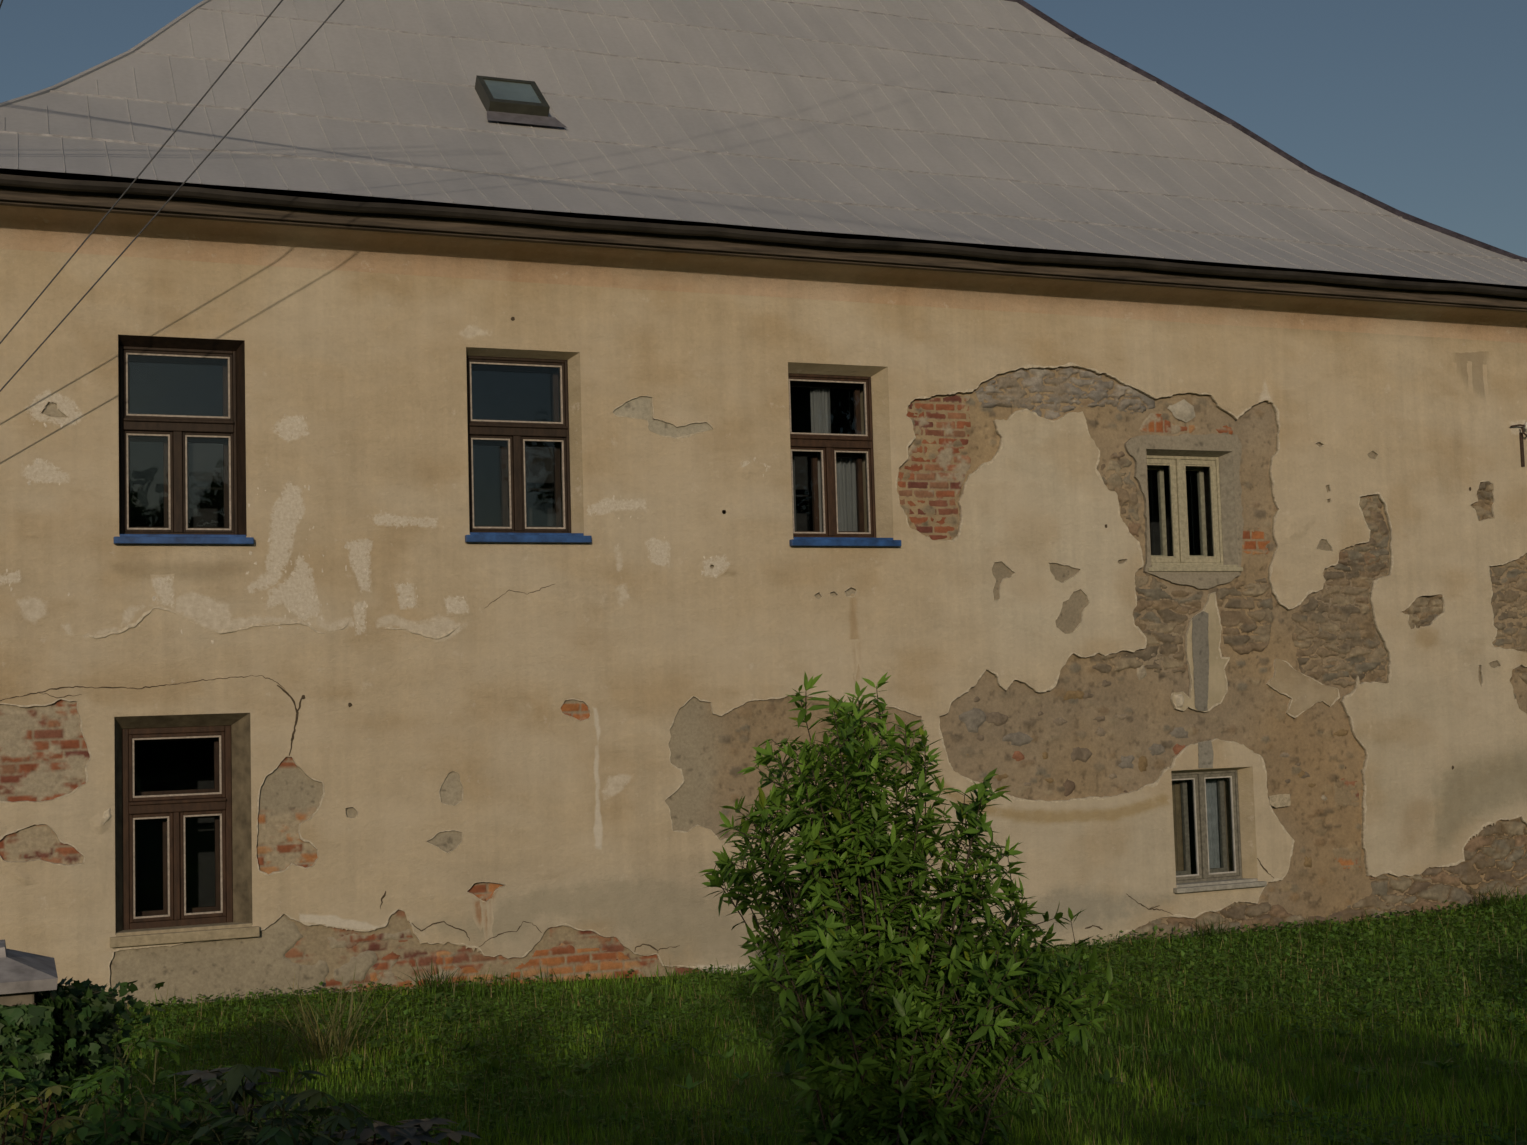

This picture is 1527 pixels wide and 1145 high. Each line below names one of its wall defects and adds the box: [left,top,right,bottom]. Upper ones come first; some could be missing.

spalling [612,396,713,439]
spalling [665,362,1527,943]
spalling [0,698,91,803]
crack [0,675,303,756]
spalling [561,698,591,721]
spalling [0,824,85,867]
spalling [256,756,325,876]
spalling [108,909,769,1007]